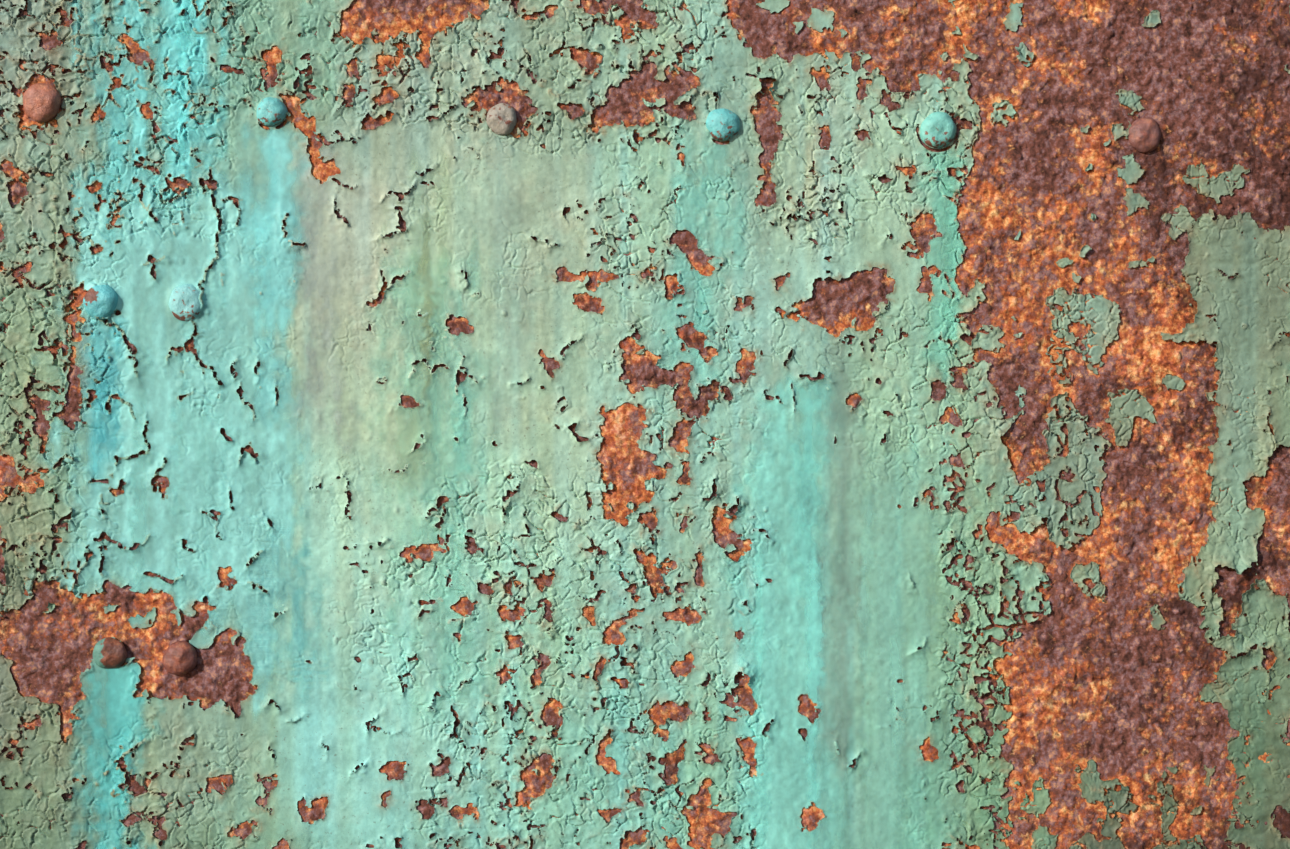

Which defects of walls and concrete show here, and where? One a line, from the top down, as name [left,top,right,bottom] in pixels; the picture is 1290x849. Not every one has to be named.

peeling [1045,287,1121,380]
crack [568,423,589,442]
corrosion [725,0,1290,849]
peeling [1105,388,1157,447]
crack [425,460,538,566]
corrosion [582,321,757,689]
crack [700,452,769,538]
peeling [1157,210,1290,849]
corrosion [0,526,258,743]
crack [398,675,472,738]
corrosion [595,700,737,849]
peeling [1031,778,1138,849]